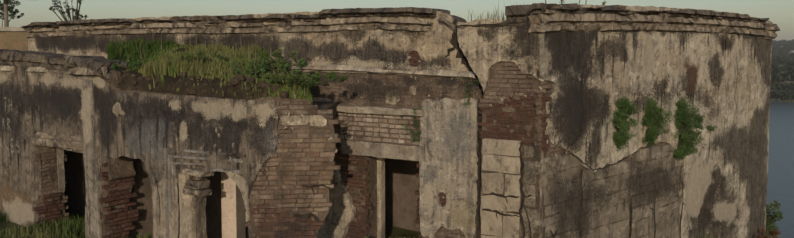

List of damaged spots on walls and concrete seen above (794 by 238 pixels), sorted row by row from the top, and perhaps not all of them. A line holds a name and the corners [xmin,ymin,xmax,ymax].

spalling [404,51,421,66]
water stain [0,81,277,172]
flaking render [169,95,189,162]
spalling [192,61,681,238]
crack [445,19,532,238]
crack [571,150,640,238]
water stain [477,14,773,238]